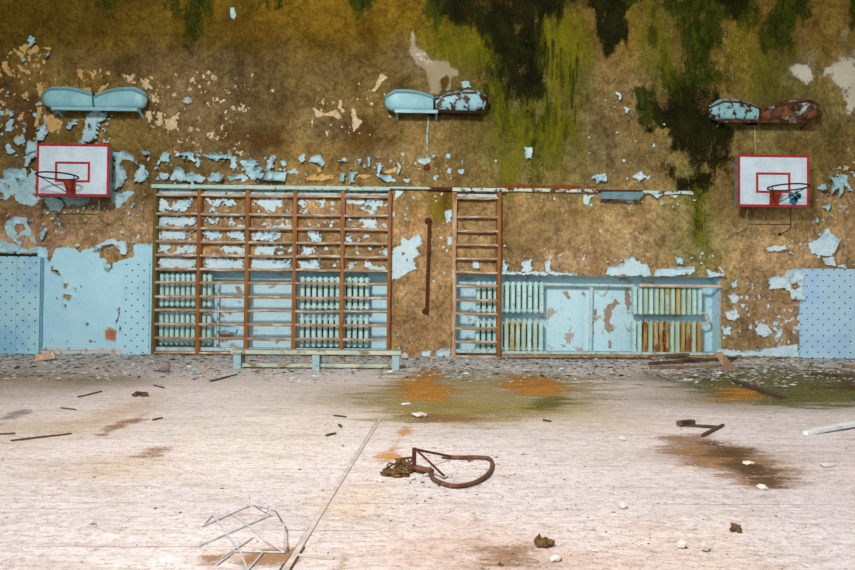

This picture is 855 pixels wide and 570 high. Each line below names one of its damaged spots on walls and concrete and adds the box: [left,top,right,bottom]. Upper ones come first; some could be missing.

water stain [409,31,459,94]
water stain [419,0,629,184]
water stain [627,0,762,235]
water stain [789,29,855,116]
peeling [0,35,464,361]
water stain [429,185,458,225]
peeling [501,248,577,276]
peeling [606,168,855,358]
peeling [594,287,631,348]
water stain [346,365,621,436]
water stain [656,434,800,489]